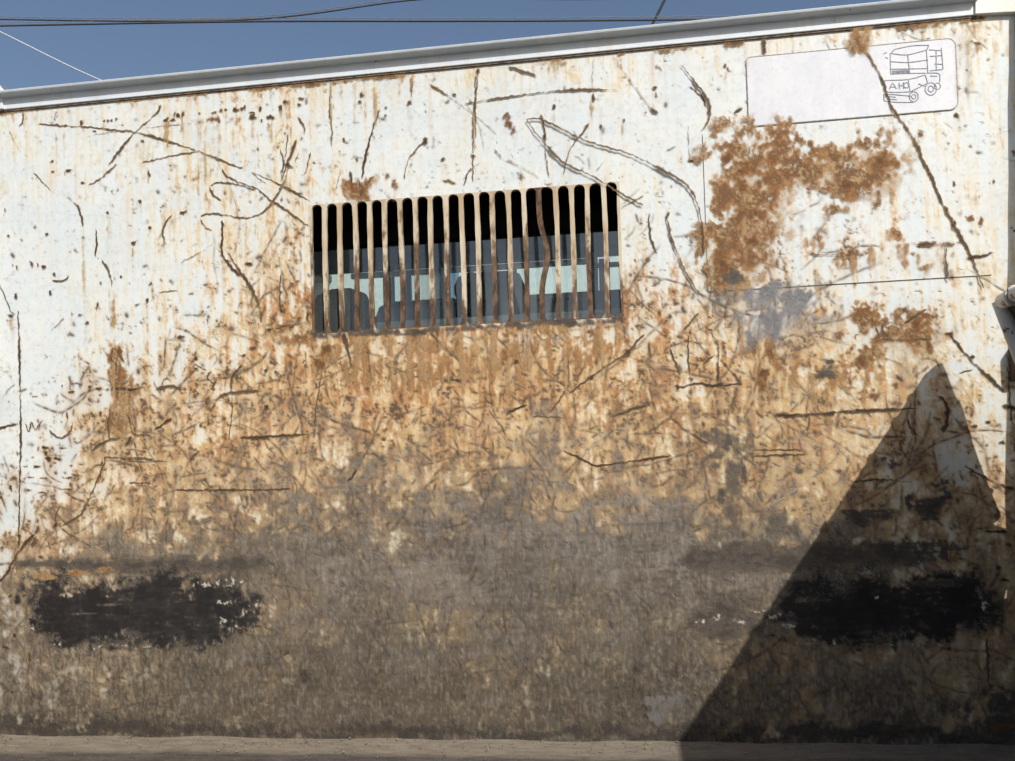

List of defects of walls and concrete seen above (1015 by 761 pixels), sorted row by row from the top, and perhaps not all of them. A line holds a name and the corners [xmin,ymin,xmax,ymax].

rust [342,171,398,201]
rust [687,115,911,294]
rust [806,228,960,280]
rust [61,343,140,439]
rust [266,311,312,345]
rust [312,322,622,398]
rust [744,301,949,406]
rust [27,446,66,493]